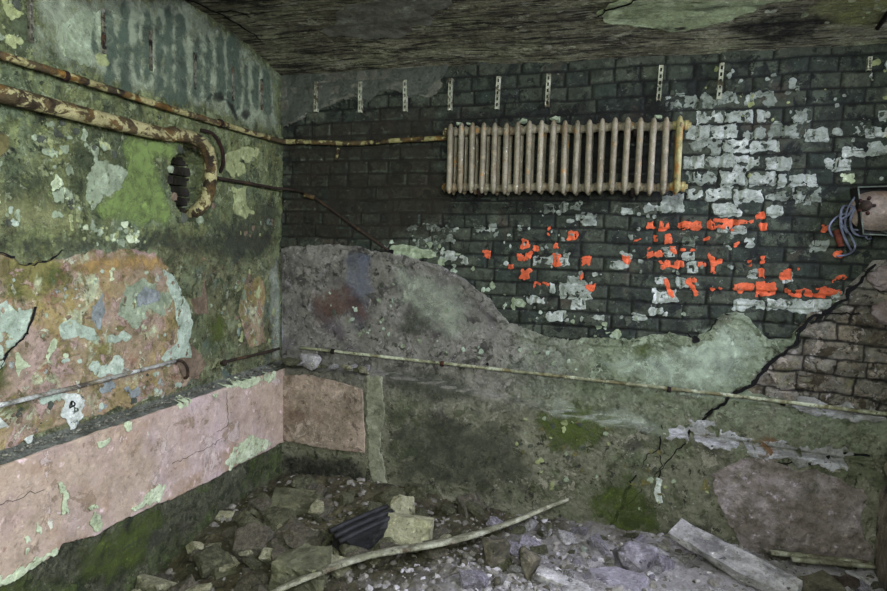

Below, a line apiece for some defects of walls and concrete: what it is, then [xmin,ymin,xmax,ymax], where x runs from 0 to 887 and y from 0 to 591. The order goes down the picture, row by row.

peeling [0,0,24,49]
peeling [61,10,104,67]
peeling [596,0,795,32]
flaking render [212,44,887,412]
peeling [0,119,223,451]
crack [610,264,876,525]
peeling [225,435,271,471]
peeling [58,481,69,515]
peeling [131,484,166,511]
peeling [0,523,59,586]